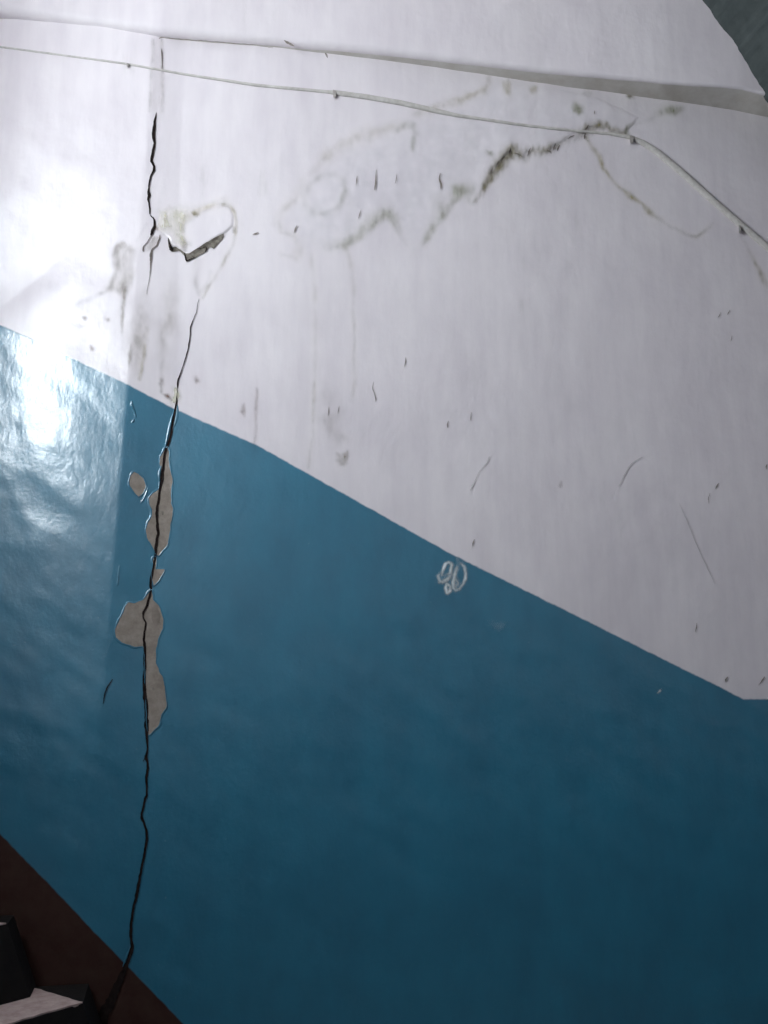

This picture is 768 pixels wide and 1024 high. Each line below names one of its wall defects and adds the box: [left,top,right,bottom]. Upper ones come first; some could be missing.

crack [142,113,160,289]
spalling [168,233,224,262]
peeling [113,446,175,737]
crack [98,300,199,1024]